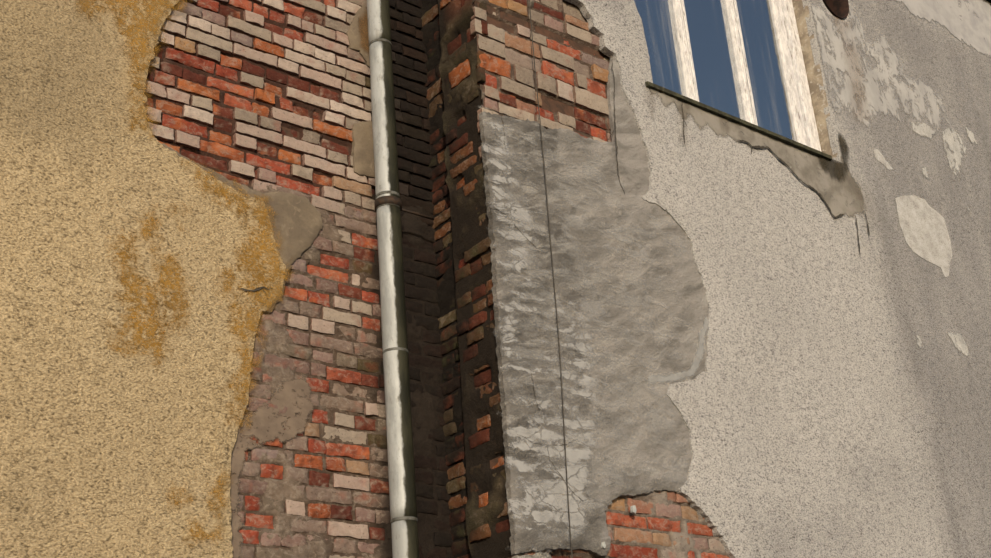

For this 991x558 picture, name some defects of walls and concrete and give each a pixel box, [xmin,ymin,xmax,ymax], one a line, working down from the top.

peeling [811,3,978,175]
peeling [891,0,991,57]
water stain [113,214,189,363]
spalling [144,0,393,558]
spalling [389,0,454,558]
spalling [470,0,650,537]
peeling [895,195,952,277]
peeling [948,331,970,356]
spalling [516,490,729,558]